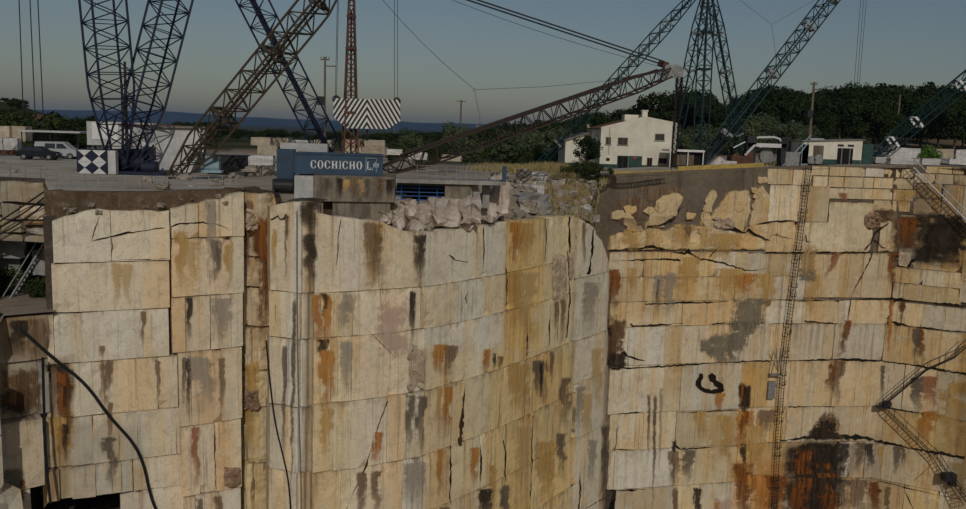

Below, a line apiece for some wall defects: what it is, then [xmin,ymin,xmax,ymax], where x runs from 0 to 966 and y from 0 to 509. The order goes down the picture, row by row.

leakage [894,214,966,262]
spalling [552,248,575,301]
crack [527,207,966,349]
rust [312,293,335,444]
rust [433,344,458,367]
leakage [700,298,765,362]
rust [826,361,845,392]
rust [841,320,852,348]
rust [436,386,453,423]
crack [347,401,388,507]
leakage [787,413,906,509]
leakage [479,485,510,509]